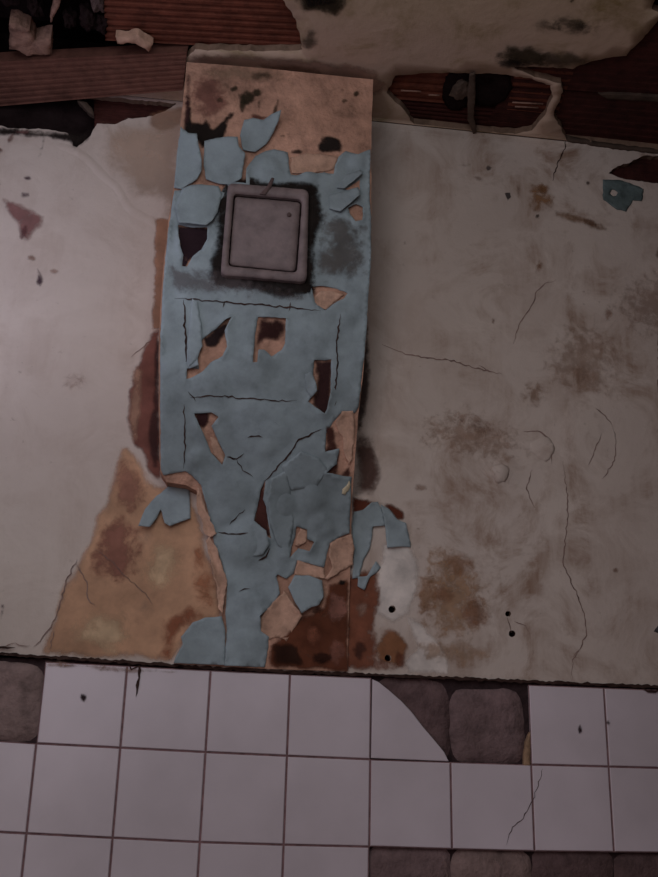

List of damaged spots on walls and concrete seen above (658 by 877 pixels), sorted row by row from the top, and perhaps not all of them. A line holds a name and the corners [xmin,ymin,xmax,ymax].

mould [497,47,582,68]
peeling [603,179,644,212]
crack [183,393,292,469]
peeling [138,110,411,667]
rust [353,329,378,512]
crack [384,345,501,374]
rust [386,504,403,519]
crack [0,429,658,695]
rust [269,571,407,671]
peeling [370,678,525,764]
crack [506,771,542,845]
peeling [369,847,658,877]